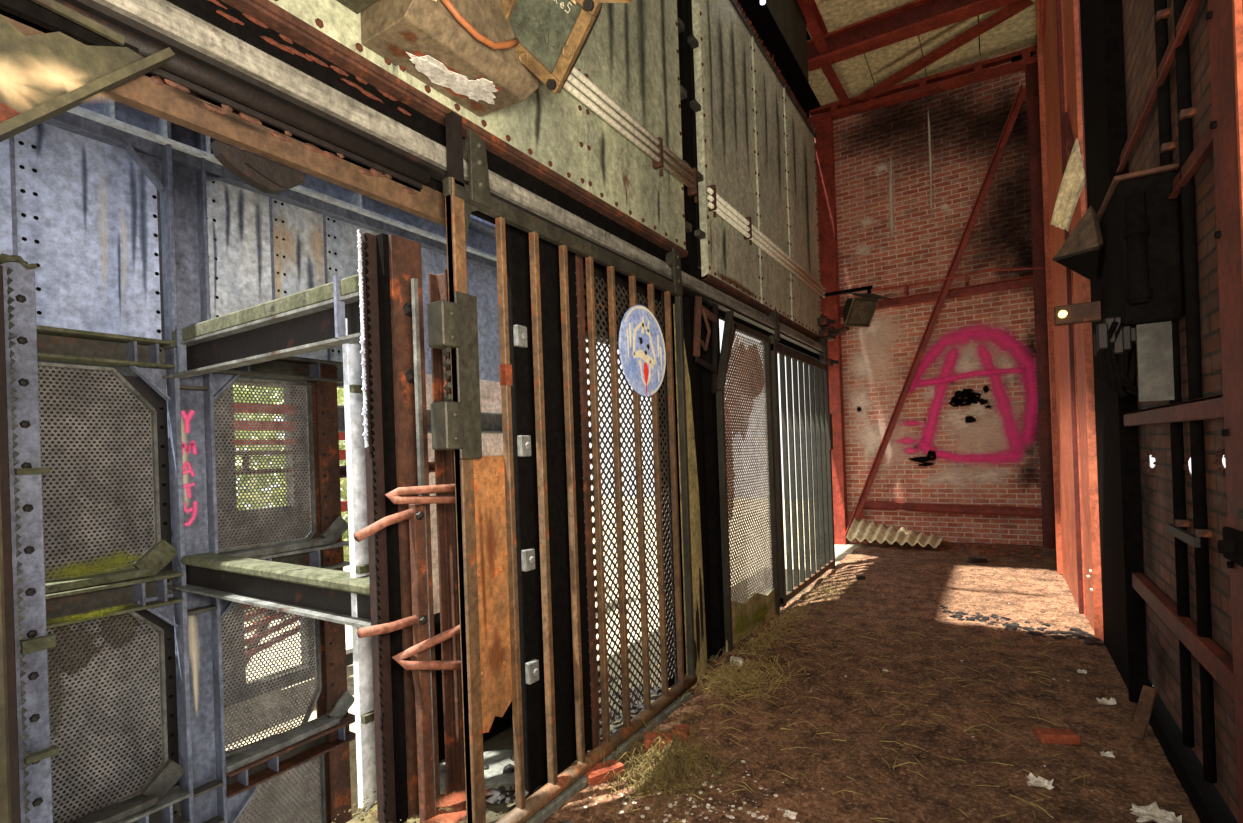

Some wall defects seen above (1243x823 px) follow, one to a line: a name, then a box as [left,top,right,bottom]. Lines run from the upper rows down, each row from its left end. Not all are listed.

peeling [403,50,501,105]
leakage [118,173,146,297]
leakage [213,190,261,300]
leakage [297,238,313,289]